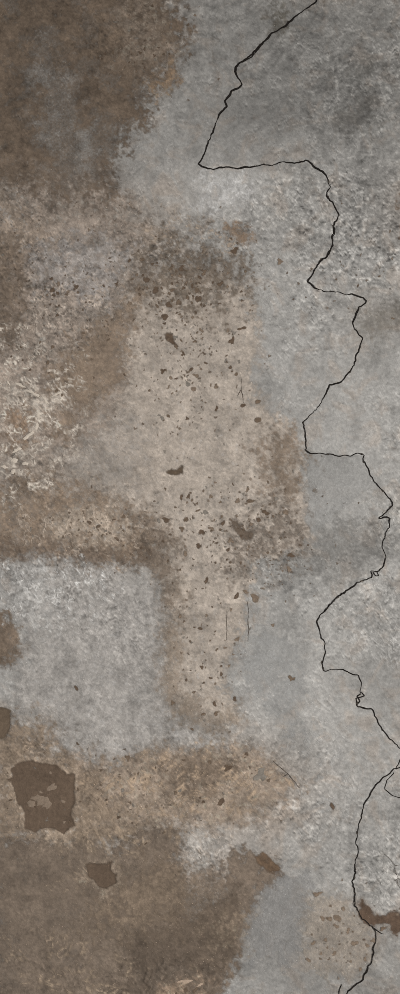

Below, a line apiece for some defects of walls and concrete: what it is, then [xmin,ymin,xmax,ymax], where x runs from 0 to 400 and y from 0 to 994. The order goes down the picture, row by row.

crack [198,0,400,994]
peeling [48,264,372,830]
spalling [0,752,82,847]
spalling [79,860,123,898]
spalling [321,899,400,971]